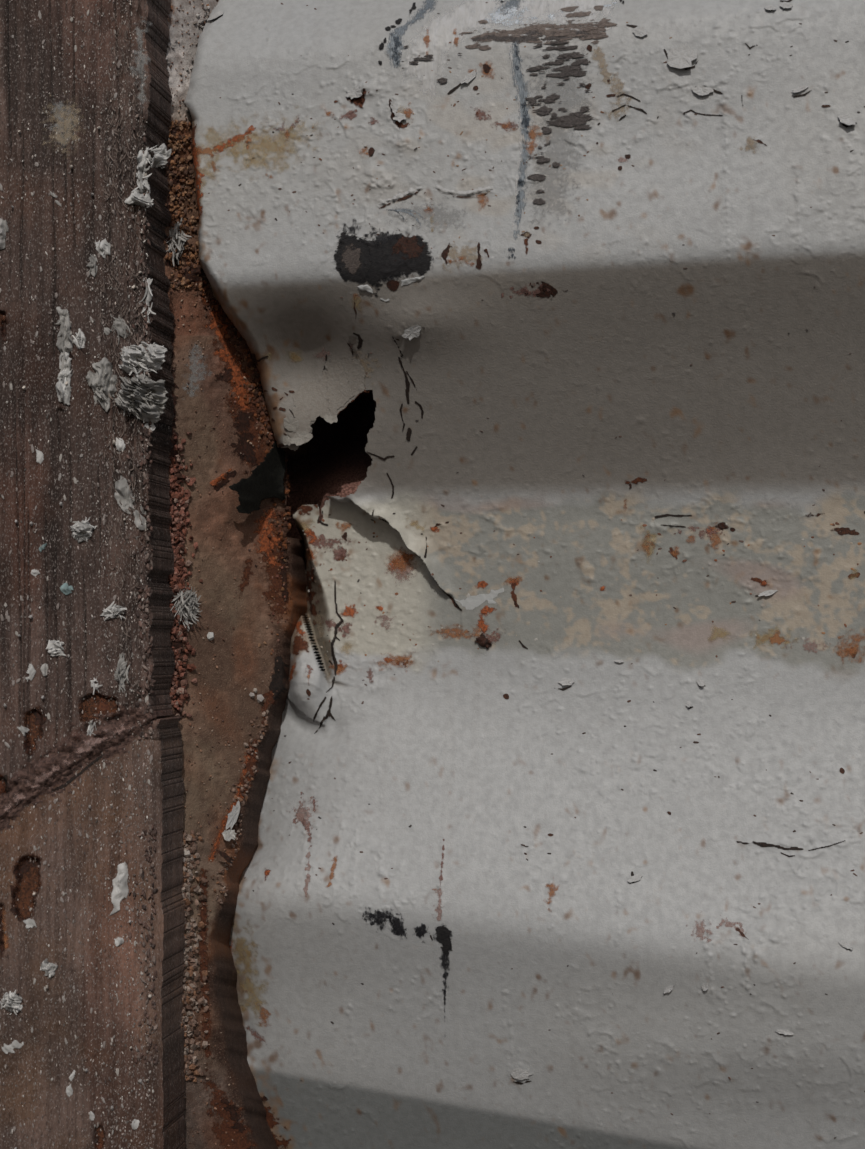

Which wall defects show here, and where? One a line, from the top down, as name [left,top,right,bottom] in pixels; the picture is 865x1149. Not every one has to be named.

peeling [378,2,416,65]
peeling [447,63,493,94]
rust [191,124,255,223]
peeling [377,185,493,228]
peeling [441,242,489,269]
peeling [521,226,542,254]
rust [183,263,285,474]
rust [670,522,735,559]
rust [505,577,522,608]
rust [437,605,500,649]
crack [313,581,344,734]
rust [197,739,259,1149]